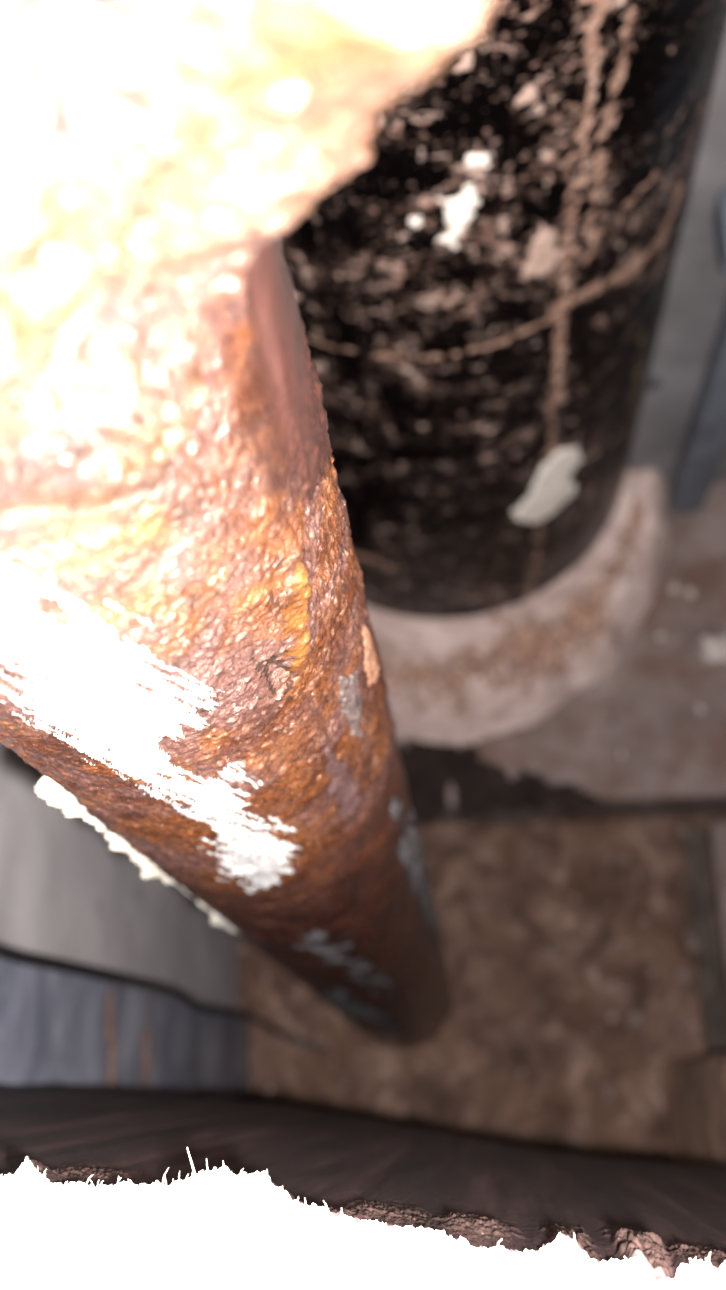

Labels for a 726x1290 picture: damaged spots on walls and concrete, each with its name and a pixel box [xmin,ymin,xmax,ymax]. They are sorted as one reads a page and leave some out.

spalling [453,49,473,71]
spalling [514,85,539,111]
spalling [409,216,422,230]
spalling [436,153,494,249]
spalling [520,223,562,280]
corrosion [248,235,331,499]
spalling [511,446,583,524]
corrosion [280,562,312,672]
peeling [0,547,302,894]
corrosion [322,747,360,823]
peeling [34,775,242,936]